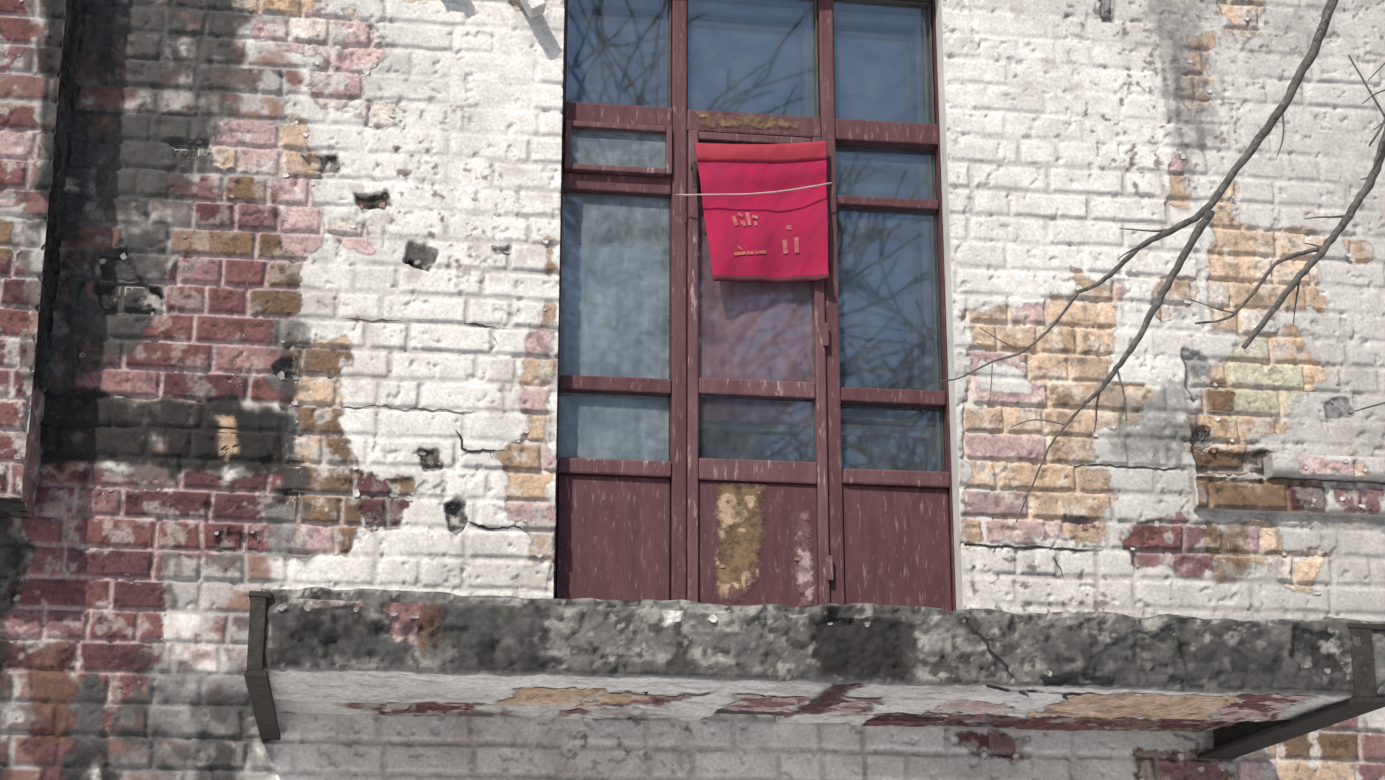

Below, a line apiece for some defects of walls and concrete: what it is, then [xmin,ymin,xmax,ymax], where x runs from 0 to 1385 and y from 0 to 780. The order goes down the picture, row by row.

water stain [170,0,186,67]
peeling [231,0,396,130]
water stain [41,0,115,424]
water stain [166,420,219,478]
peeling [0,105,443,741]
crack [342,403,502,457]
peeling [960,183,1384,595]
spalling [446,502,468,535]
crack [468,520,530,535]
water stain [814,614,918,677]
crack [965,616,1102,700]
peeling [822,670,1385,780]